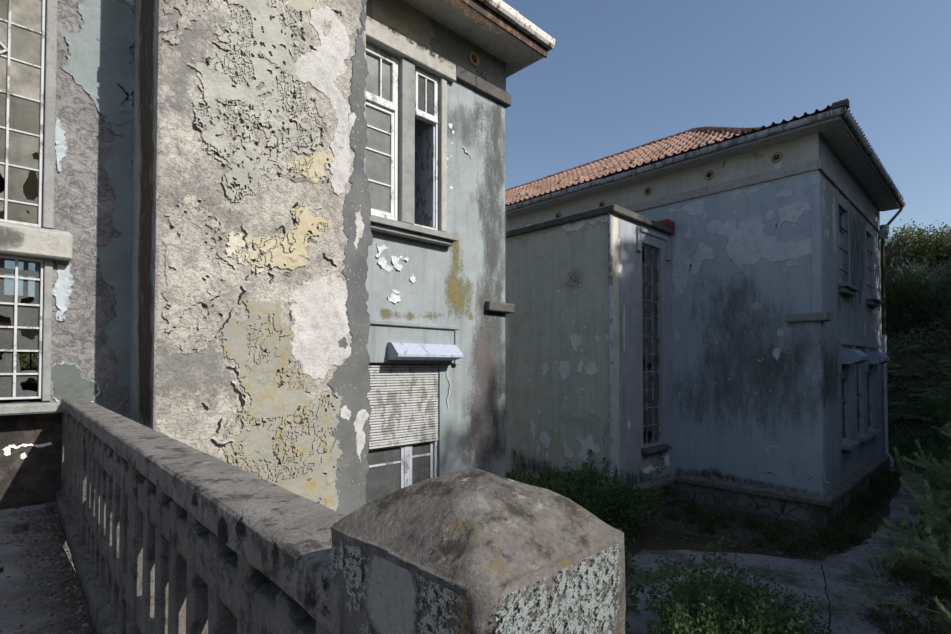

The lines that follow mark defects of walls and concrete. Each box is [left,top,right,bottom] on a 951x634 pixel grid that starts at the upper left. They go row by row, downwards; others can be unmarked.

peeling [55,116,68,172]
peeling [52,264,74,323]
peeling [60,0,135,388]
peeling [158,0,436,516]
water stain [445,102,595,480]
peeling [668,190,812,297]
peeling [521,309,598,398]
water stain [690,284,812,420]
peeling [2,442,52,459]
peeling [529,419,602,465]